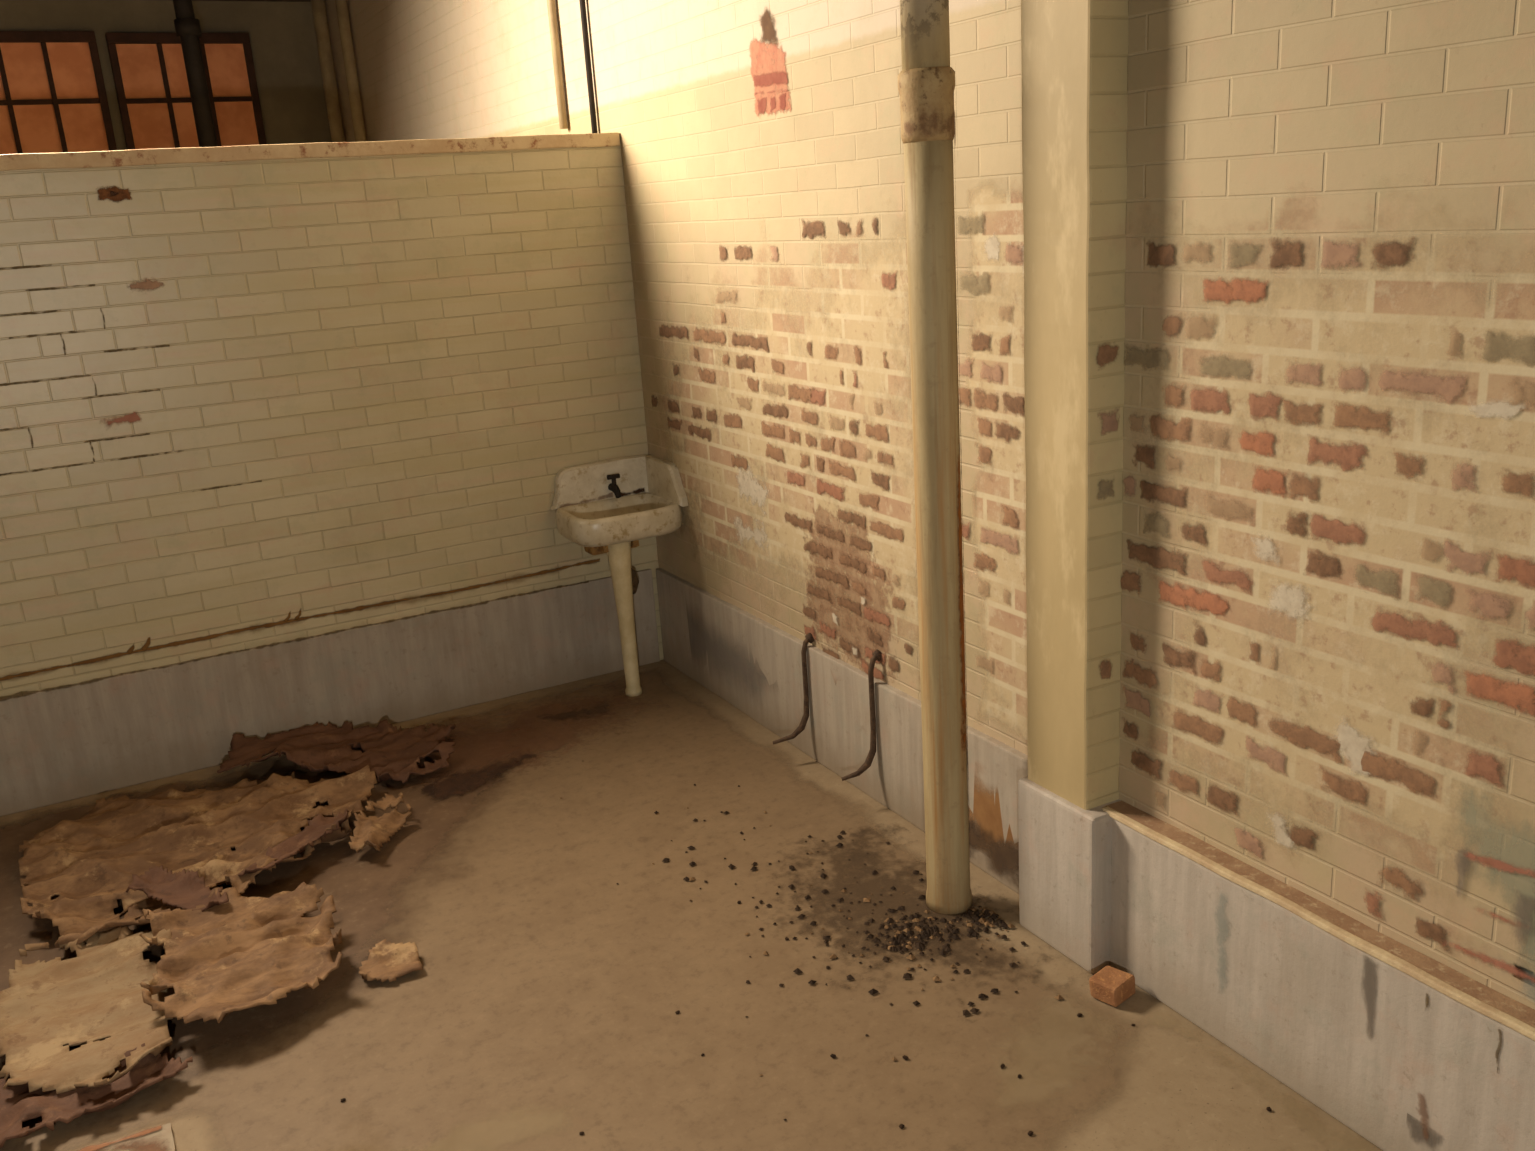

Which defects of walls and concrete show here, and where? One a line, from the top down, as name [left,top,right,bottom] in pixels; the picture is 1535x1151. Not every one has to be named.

peeling [652,218,919,680]
peeling [957,186,1028,741]
peeling [1097,223,1535,918]
leakage [0,670,1134,1151]
corrosion [968,782,1019,881]
leakage [1363,959,1376,1036]
peeling [1415,918,1447,951]
leakage [1455,945,1535,982]
leakage [1457,804,1535,957]
leakage [1406,1113,1439,1146]